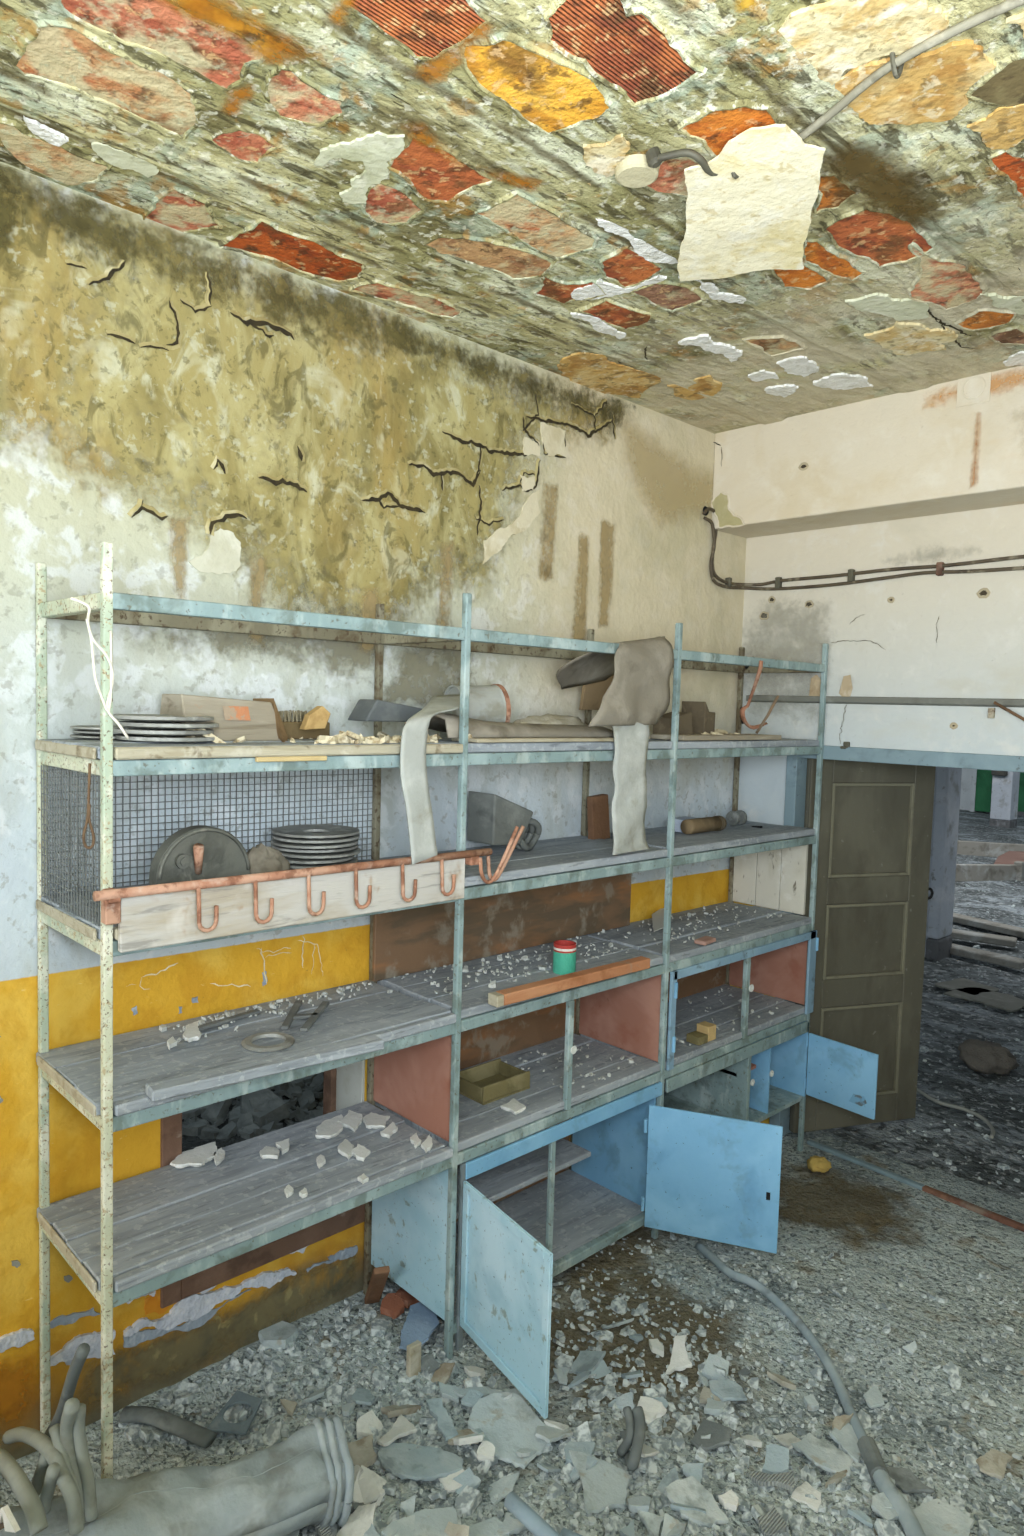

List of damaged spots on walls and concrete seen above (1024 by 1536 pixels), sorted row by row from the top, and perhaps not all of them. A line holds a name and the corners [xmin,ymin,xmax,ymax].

spalling [339,0,708,135]
spalling [644,99,791,198]
peeling [778,0,1024,211]
crack [65,259,125,285]
crack [106,272,296,351]
spalling [314,131,707,330]
spalling [771,173,1024,356]
crack [127,498,168,521]
crack [204,445,308,534]
water stain [0,165,622,640]
crack [360,392,616,536]
water stain [207,632,375,670]